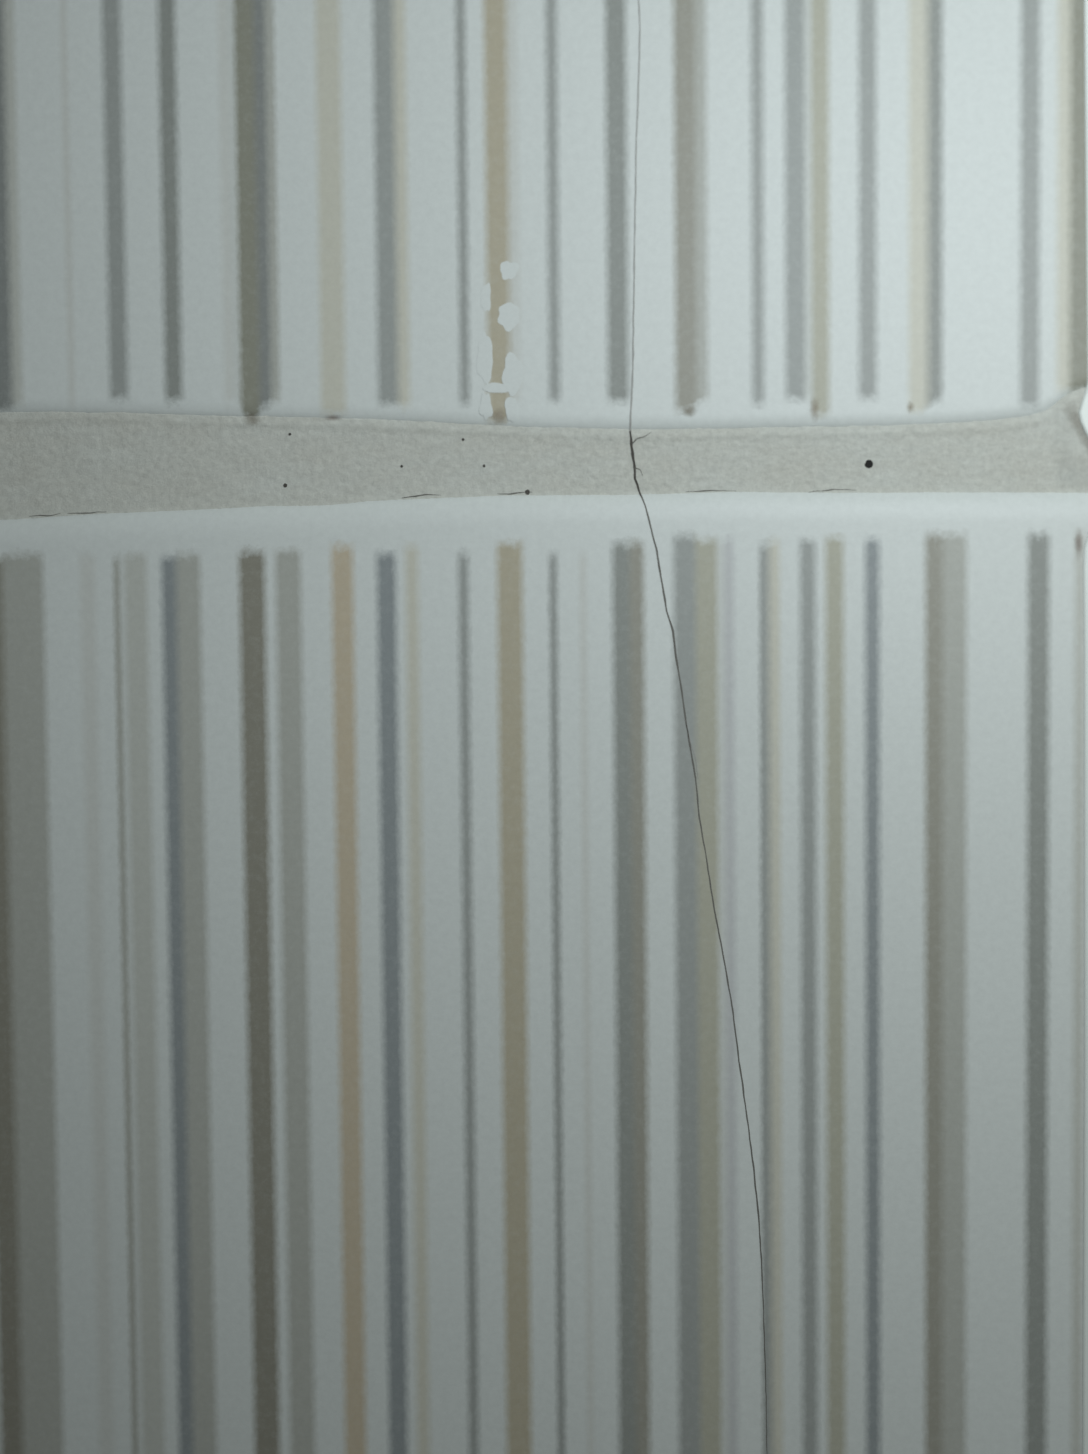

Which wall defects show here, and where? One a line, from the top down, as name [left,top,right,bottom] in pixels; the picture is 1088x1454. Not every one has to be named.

crack [629,0,767,1448]